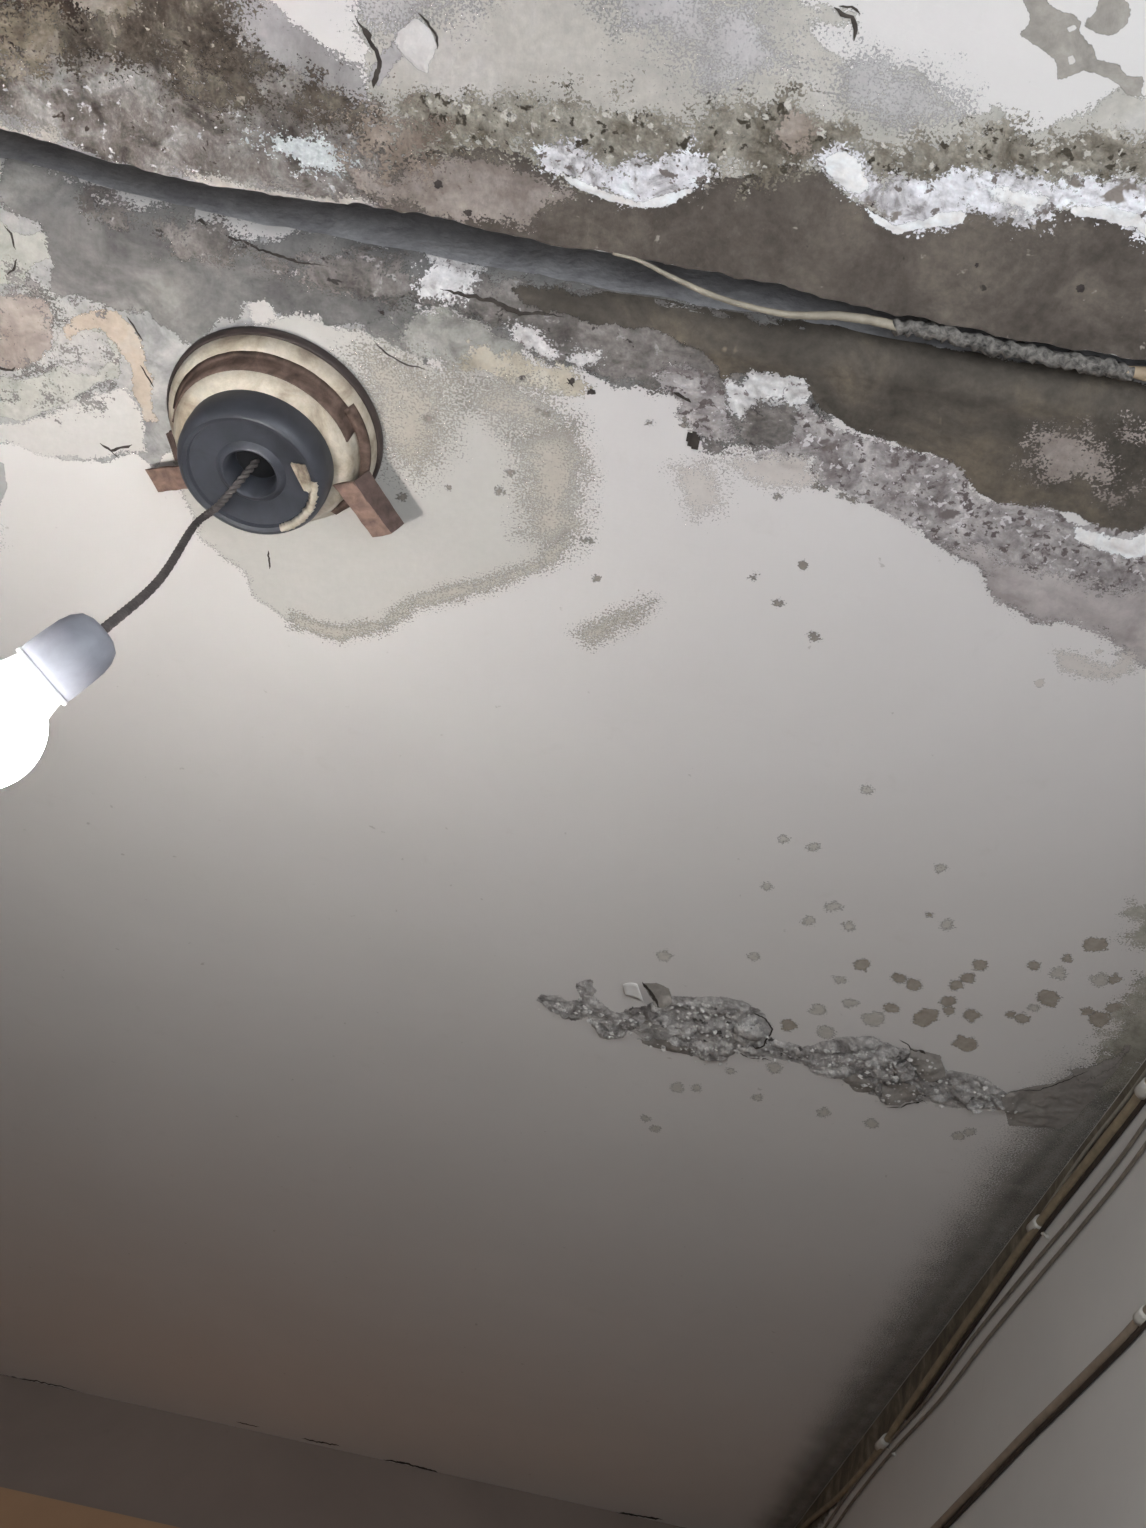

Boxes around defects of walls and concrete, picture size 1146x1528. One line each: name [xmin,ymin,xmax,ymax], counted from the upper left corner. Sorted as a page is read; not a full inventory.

leakage [0,0,143,163]
peeling [0,196,283,467]
spalling [290,462,311,493]
crack [356,18,382,88]
crack [418,13,439,49]
spalling [0,0,1146,360]
crack [0,129,1146,381]
leakage [0,158,1146,688]
leakage [227,0,1146,252]
spalling [511,284,1146,533]
crack [834,5,860,40]
leakage [755,958,1146,1528]